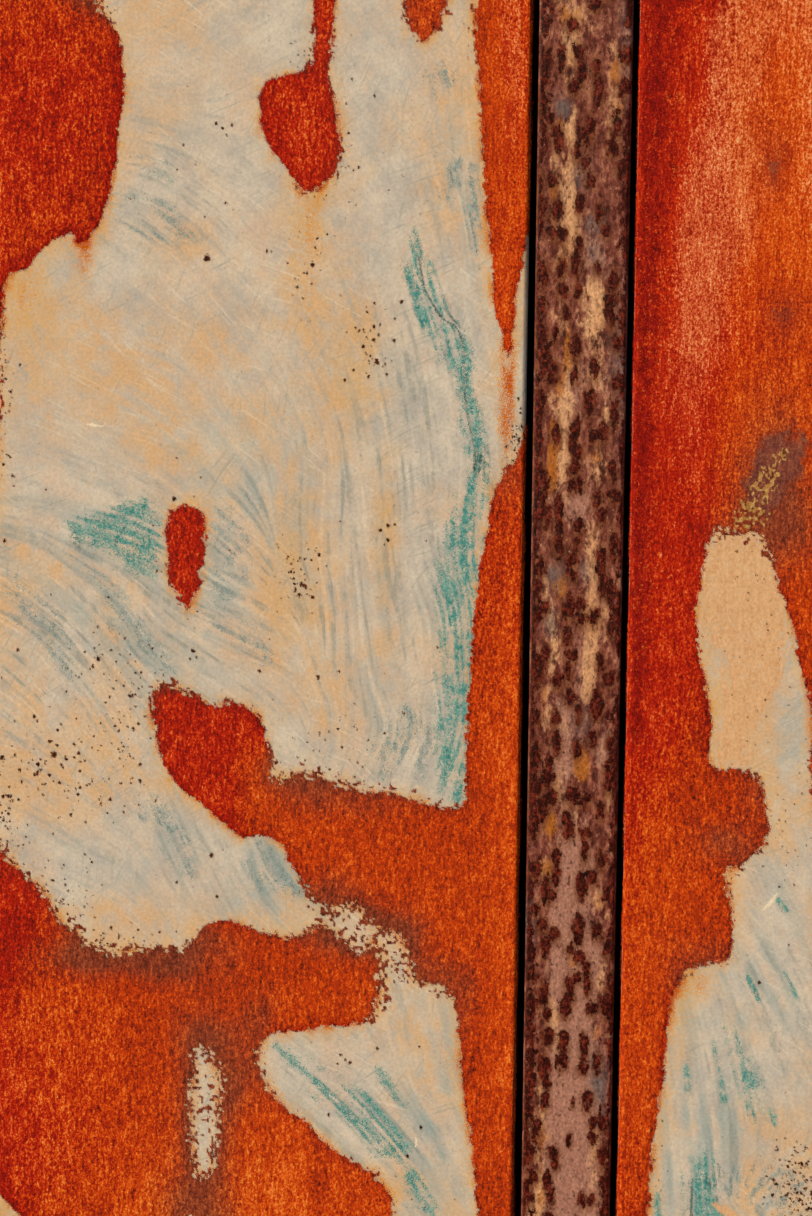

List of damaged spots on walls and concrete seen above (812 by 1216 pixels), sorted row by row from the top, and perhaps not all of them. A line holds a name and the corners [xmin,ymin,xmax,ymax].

rust [0,0,605,1216]
rust [522,0,812,1216]